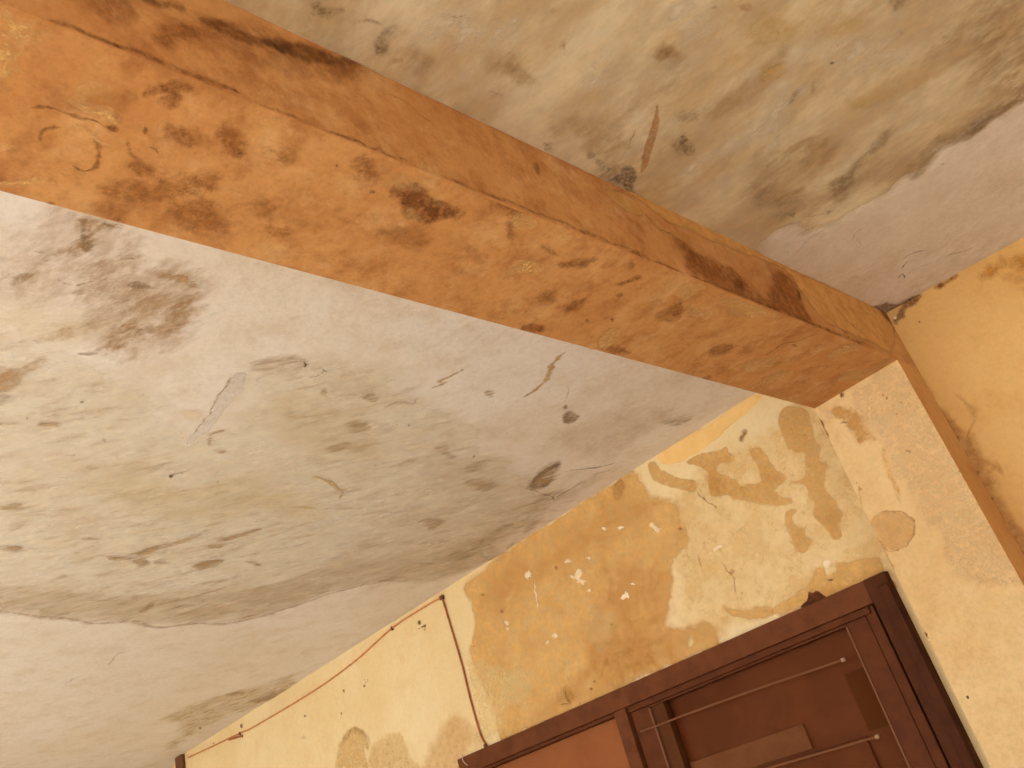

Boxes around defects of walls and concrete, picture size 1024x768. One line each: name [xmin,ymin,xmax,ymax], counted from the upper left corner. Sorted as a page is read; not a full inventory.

water stain [204,0,1024,251]
water stain [68,220,115,252]
water stain [0,364,718,740]
flaking render [564,556,591,592]
flaking render [801,591,826,608]